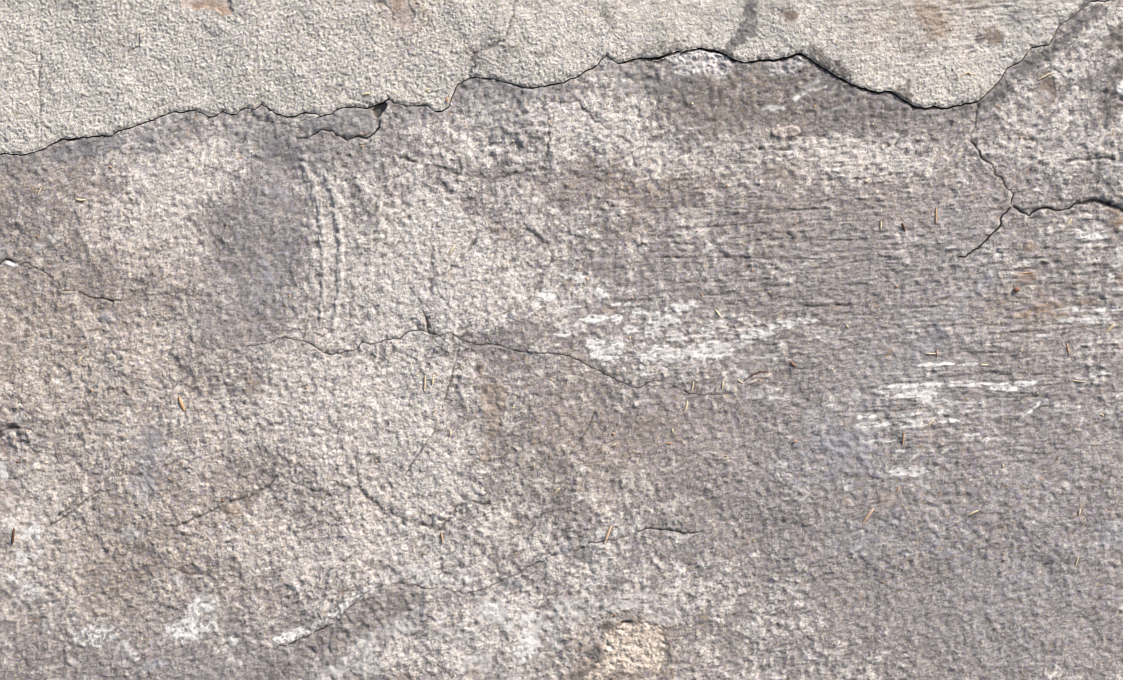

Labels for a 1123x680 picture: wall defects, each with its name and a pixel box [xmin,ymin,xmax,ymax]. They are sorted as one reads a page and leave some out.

spalling [665,49,733,79]
spalling [765,57,805,76]
flaking render [300,109,376,137]
crack [0,0,1123,258]
crack [0,258,121,302]
crack [250,312,658,388]
crack [690,371,767,395]
flaking render [736,370,771,384]
peeling [0,461,9,480]
spalling [557,524,636,553]
spalling [272,565,475,644]
spalling [572,621,669,680]